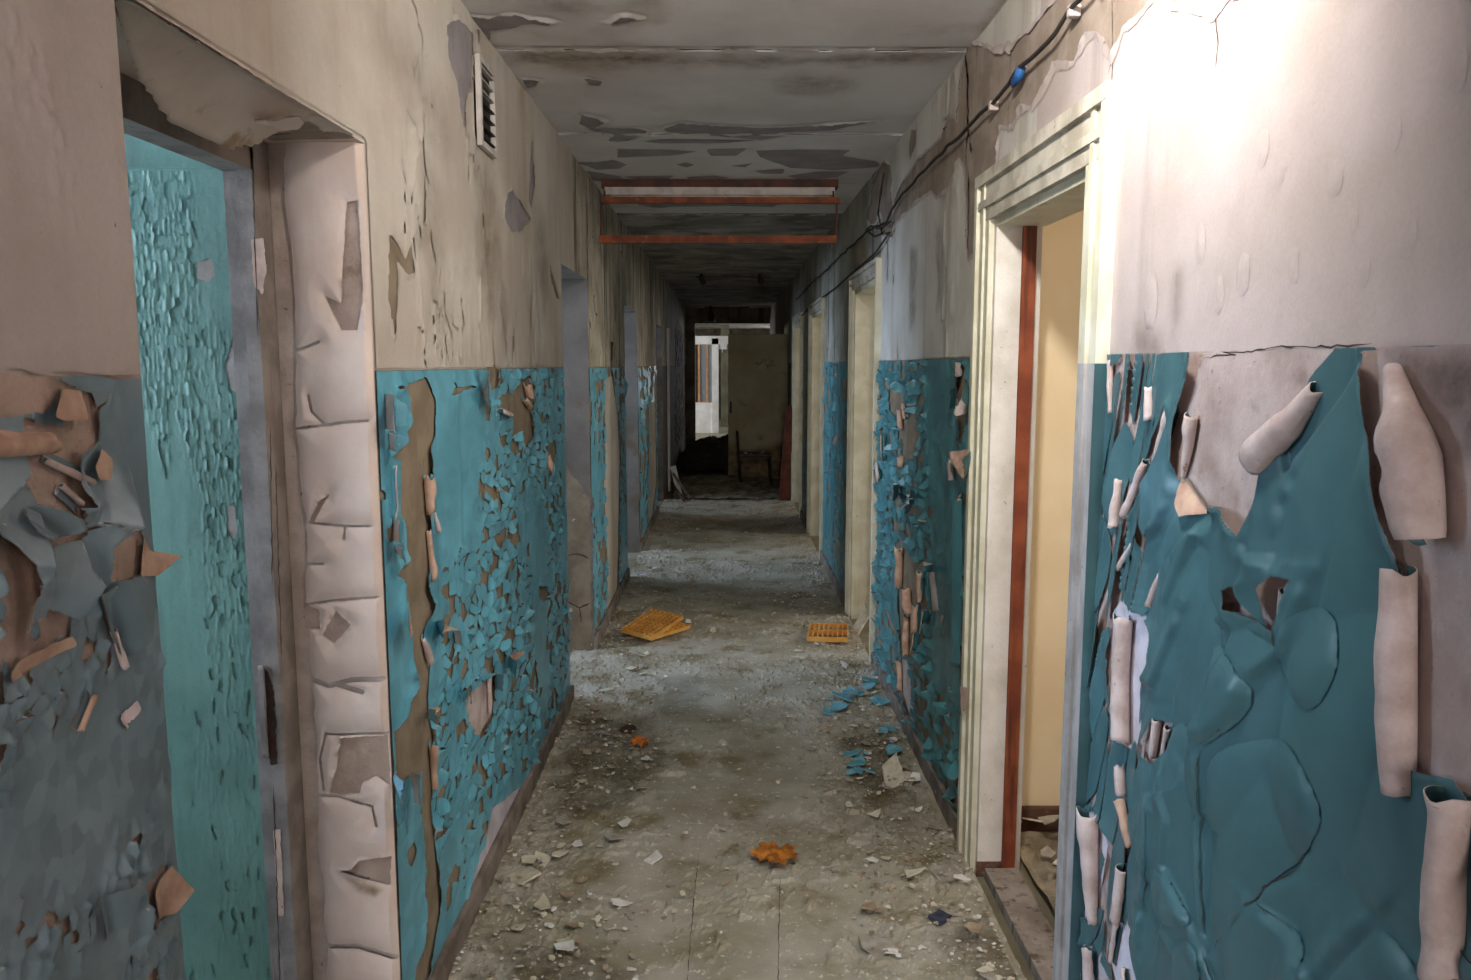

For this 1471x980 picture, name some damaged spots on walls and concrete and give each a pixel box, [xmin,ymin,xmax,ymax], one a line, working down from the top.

peeling [327,200,363,330]
peeling [386,229,416,344]
peeling [445,11,563,137]
peeling [572,0,1234,271]
peeling [0,373,113,540]
peeling [330,378,475,980]
peeling [464,651,525,735]
peeling [452,365,620,652]
peeling [894,362,971,722]
peeling [1076,574,1173,980]
peeling [1107,348,1334,529]
peeling [1373,346,1471,980]